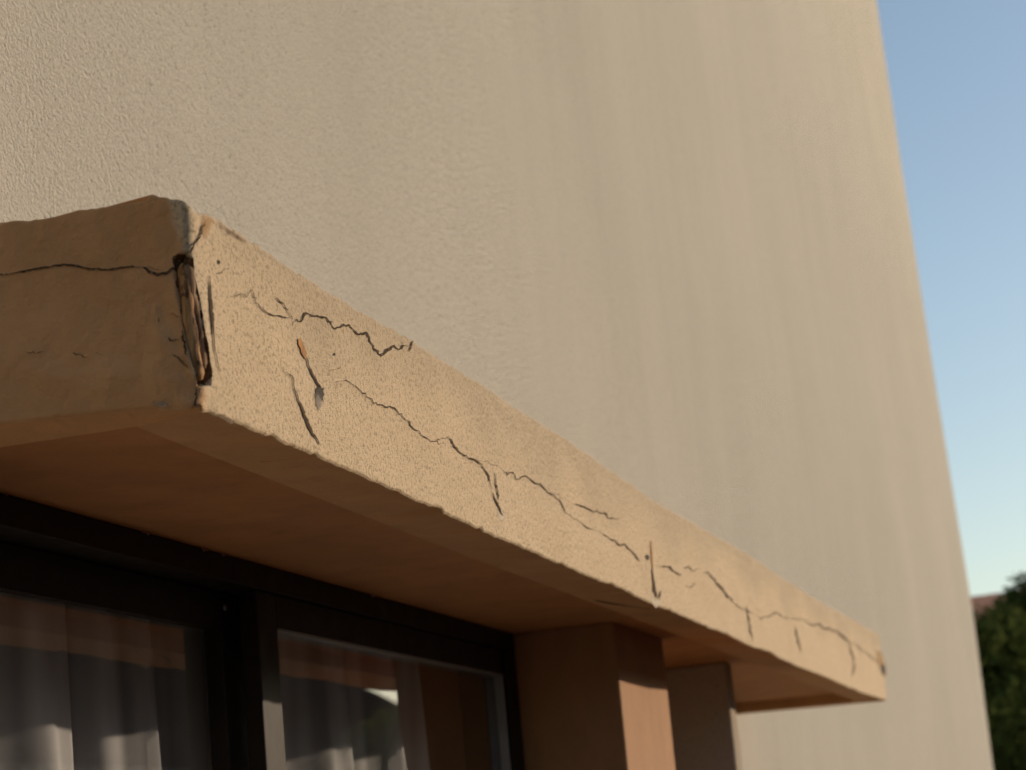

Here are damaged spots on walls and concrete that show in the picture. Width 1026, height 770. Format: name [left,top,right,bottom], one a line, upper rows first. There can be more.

crack [0,224,205,406]
crack [286,372,320,444]
crack [209,268,414,372]
crack [329,366,878,676]